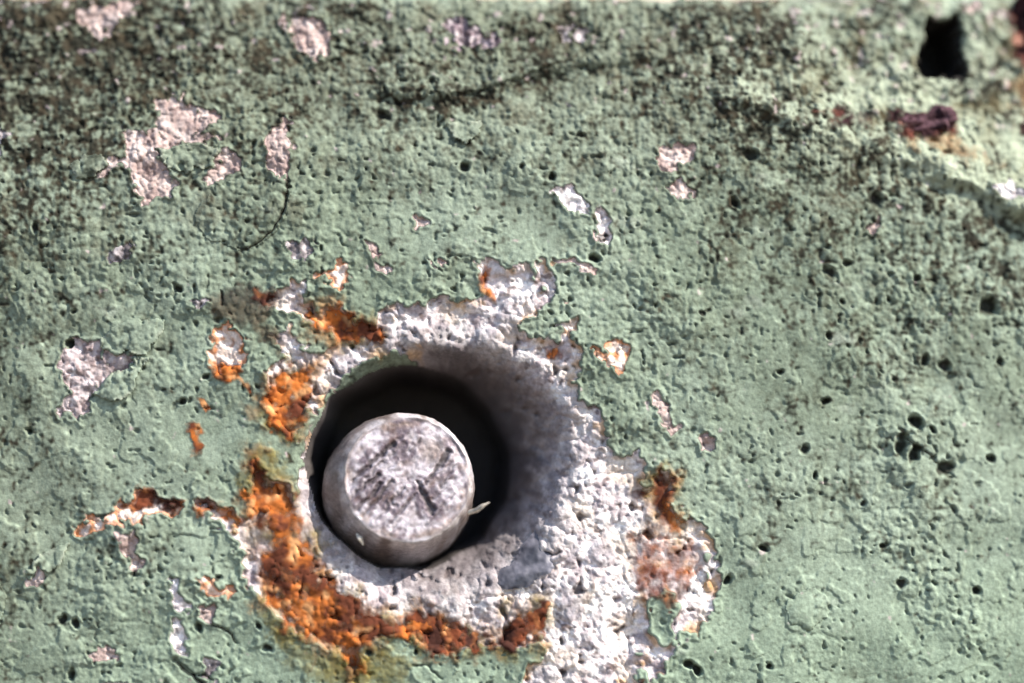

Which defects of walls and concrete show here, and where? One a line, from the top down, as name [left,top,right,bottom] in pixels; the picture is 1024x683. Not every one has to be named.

peeling [77,0,140,41]
peeling [279,13,331,62]
peeling [69,92,241,206]
peeling [656,142,696,199]
peeling [549,184,612,244]
rust [306,301,384,349]
rust [213,363,318,441]
rust [121,487,183,516]
spalling [24,257,722,683]
rust [636,469,682,532]
rust [196,452,551,683]
rust [637,531,694,607]